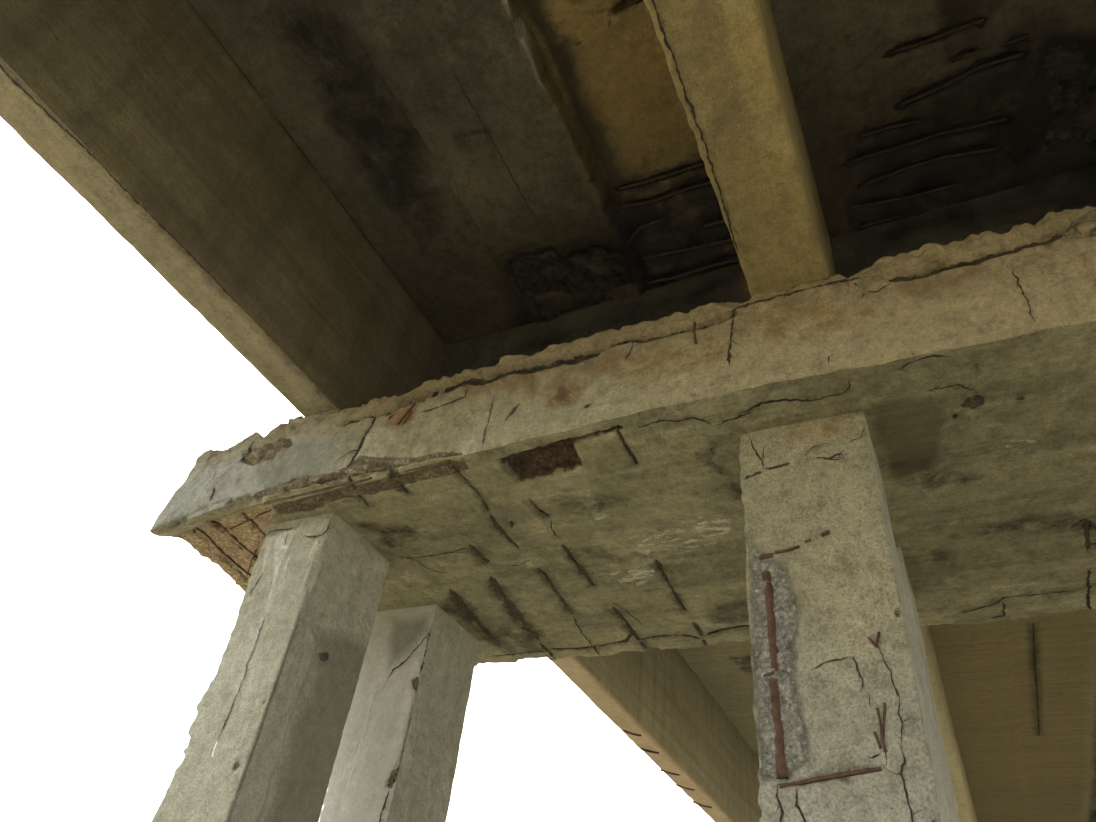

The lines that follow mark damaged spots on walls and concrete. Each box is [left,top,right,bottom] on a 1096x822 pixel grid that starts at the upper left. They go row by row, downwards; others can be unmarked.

crack [651,0,739,252]
spalling [237,439,293,466]
spalling [502,425,637,481]
crack [247,516,334,596]
spalling [172,452,519,592]
crack [218,618,265,735]
crack [389,632,430,676]
crack [489,625,749,657]
spalling [752,530,887,788]
crack [962,591,1092,618]
crack [812,648,922,822]
crack [775,785,807,822]